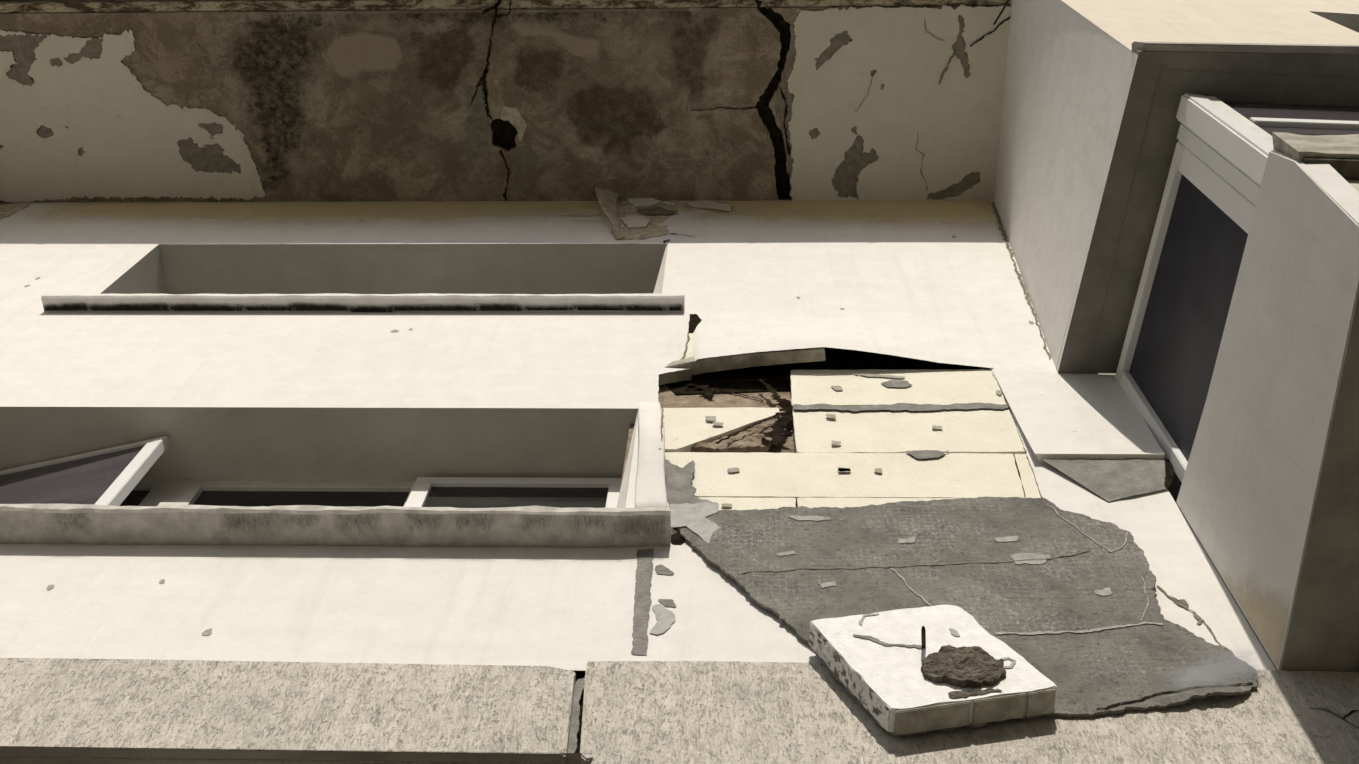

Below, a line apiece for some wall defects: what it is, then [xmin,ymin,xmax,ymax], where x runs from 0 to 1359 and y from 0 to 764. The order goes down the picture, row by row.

peeling [0,30,265,221]
damp [68,13,601,219]
crack [463,0,540,202]
crack [692,0,795,201]
peeling [787,5,1011,201]
spalling [1035,454,1165,463]
peeling [650,599,676,635]
peeling [655,564,674,575]